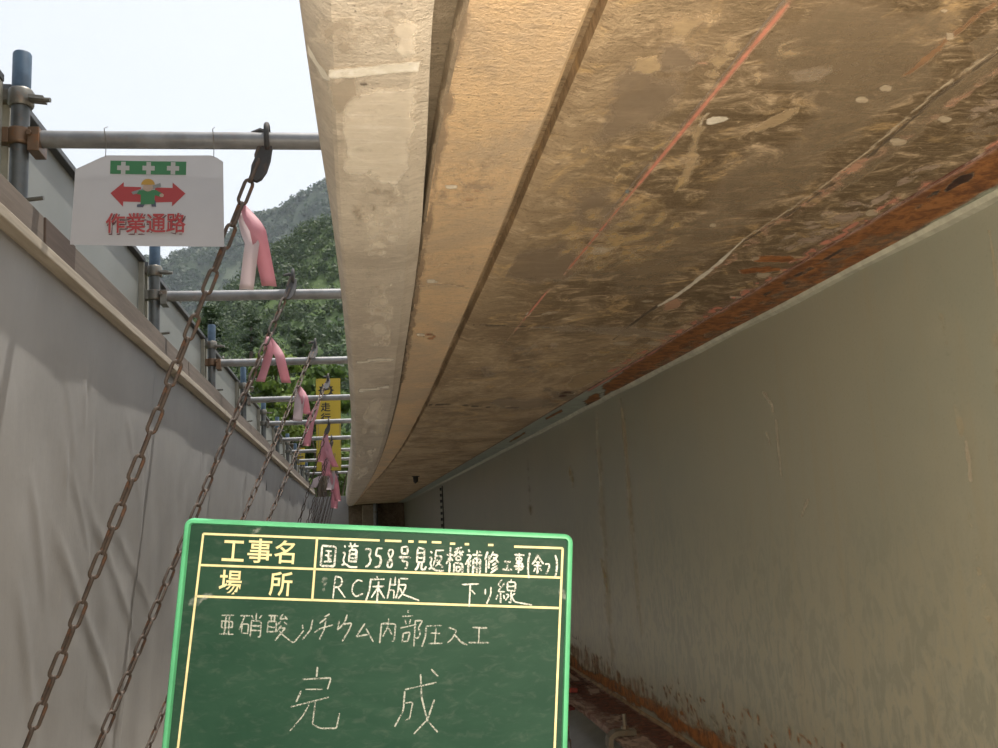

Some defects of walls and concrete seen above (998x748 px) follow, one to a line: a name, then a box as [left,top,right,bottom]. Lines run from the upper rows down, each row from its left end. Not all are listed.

crack [576,53,998,340]
rust [583,148,998,405]
rust [569,637,759,748]